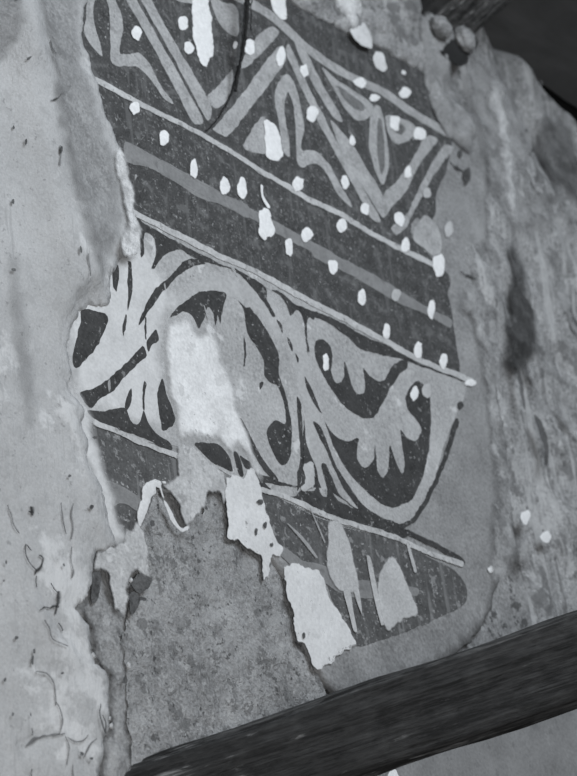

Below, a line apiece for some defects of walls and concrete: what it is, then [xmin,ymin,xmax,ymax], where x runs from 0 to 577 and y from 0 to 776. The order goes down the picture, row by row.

flaking render [83,318,362,776]
peeling [367,555,418,631]